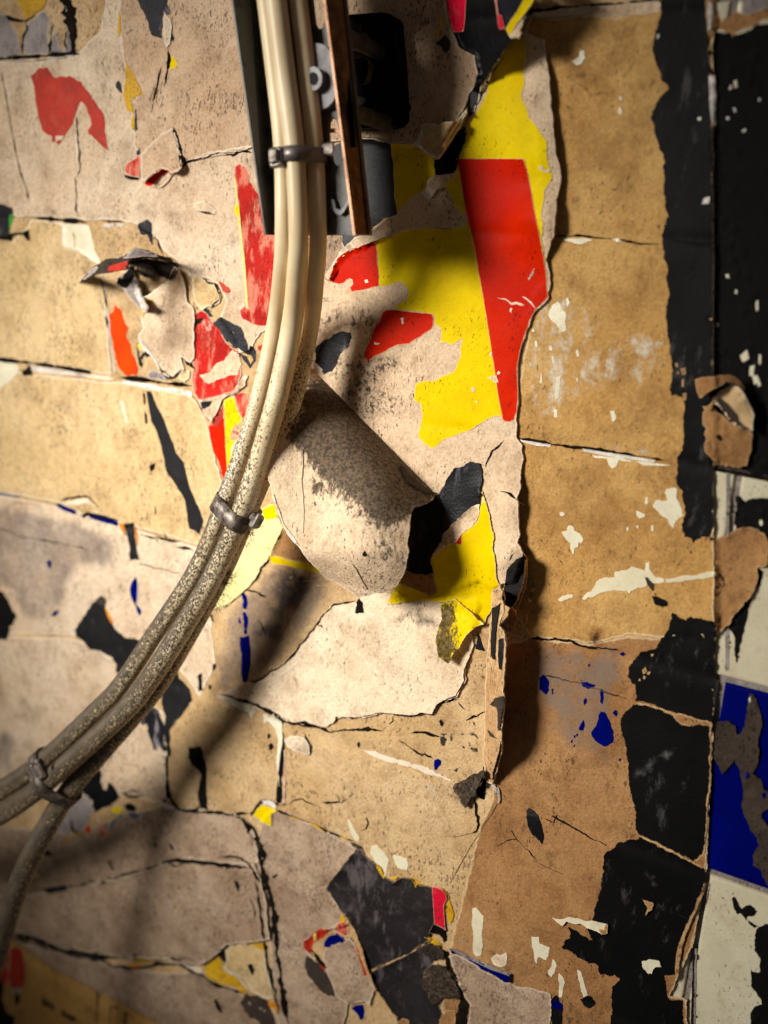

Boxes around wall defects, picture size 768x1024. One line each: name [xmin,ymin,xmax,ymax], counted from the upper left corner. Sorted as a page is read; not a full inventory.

crack [173,128,252,168]
crack [216,601,495,759]
crack [120,790,141,798]
peeling [713,694,768,885]
crack [13,932,242,993]
crack [66,800,289,1024]
peeling [642,959,662,974]
peeling [732,897,768,1024]